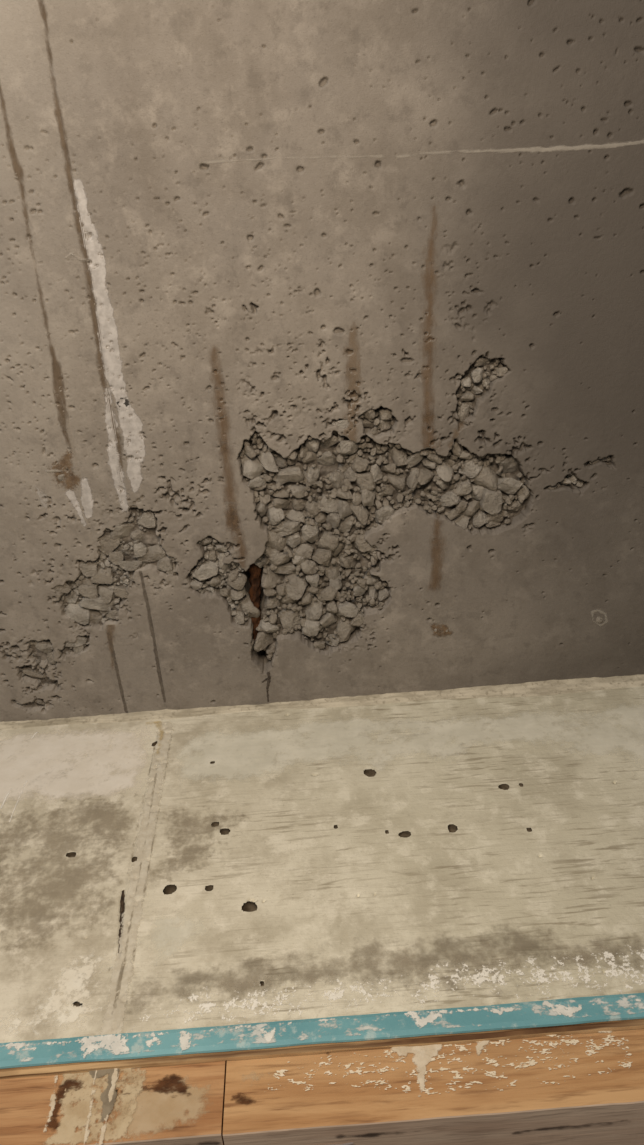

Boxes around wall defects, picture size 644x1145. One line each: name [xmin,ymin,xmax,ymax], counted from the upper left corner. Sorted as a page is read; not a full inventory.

efflorescence [73,180,145,511]
efflorescence [65,477,94,526]
corrosion [215,370,244,563]
spalling [248,563,262,640]
efflorescence [3,954,102,1034]
damp [140,945,644,1023]